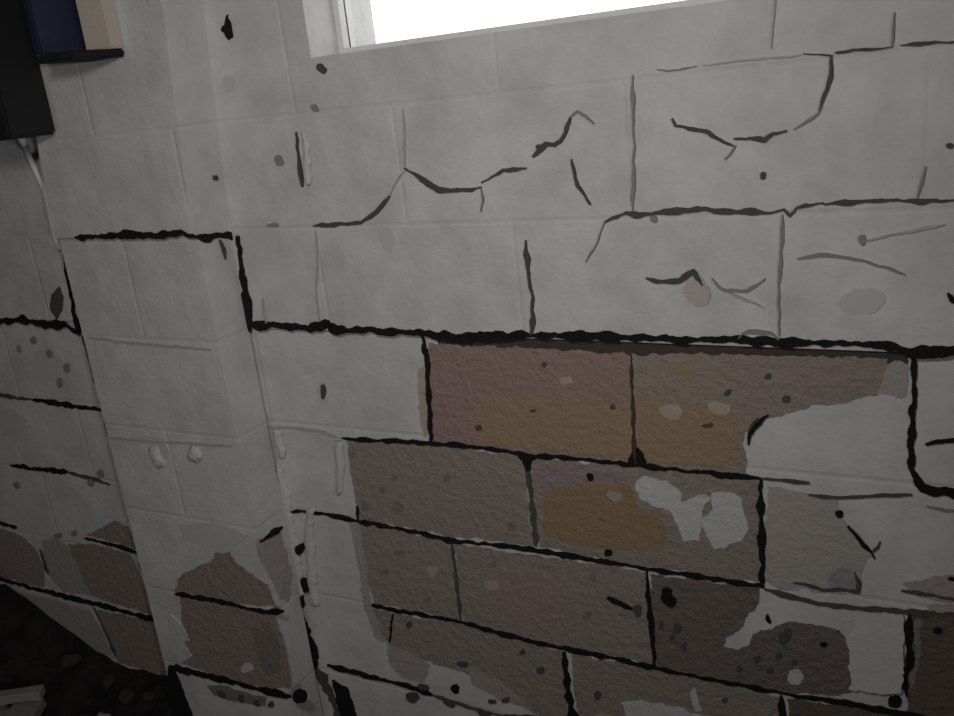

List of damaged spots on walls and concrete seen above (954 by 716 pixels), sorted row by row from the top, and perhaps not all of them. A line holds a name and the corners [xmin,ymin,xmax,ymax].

crack [295,132,304,187]
crack [313,110,527,228]
crack [532,110,595,158]
crack [570,159,591,205]
crack [586,75,954,262]
crack [0,254,212,384]
crack [10,463,110,485]
crack [0,393,233,460]
crack [74,215,954,716]
peeling [346,338,954,716]
crack [0,549,154,657]
peeling [17,520,308,716]